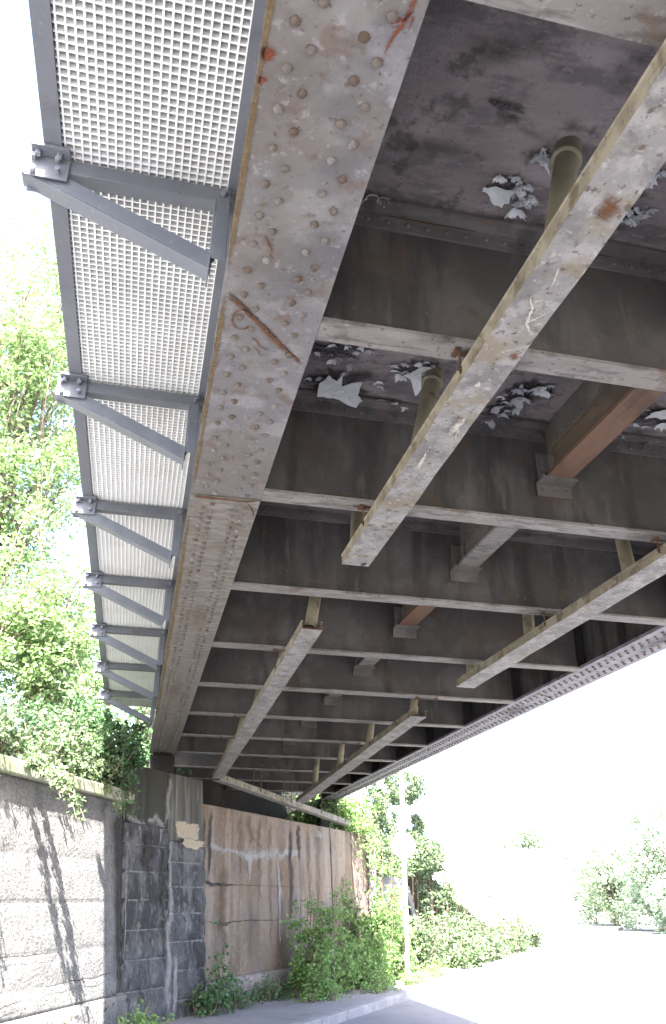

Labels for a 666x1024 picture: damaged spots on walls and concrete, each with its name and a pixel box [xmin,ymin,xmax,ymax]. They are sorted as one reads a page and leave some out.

rust [385,0,416,52]
rust [227,0,275,257]
peeling [528,147,551,174]
peeling [482,174,540,222]
rust [598,197,620,221]
peeling [305,343,439,412]
peeling [480,380,556,429]
rust [157,307,225,713]
spalling [175,821,204,850]